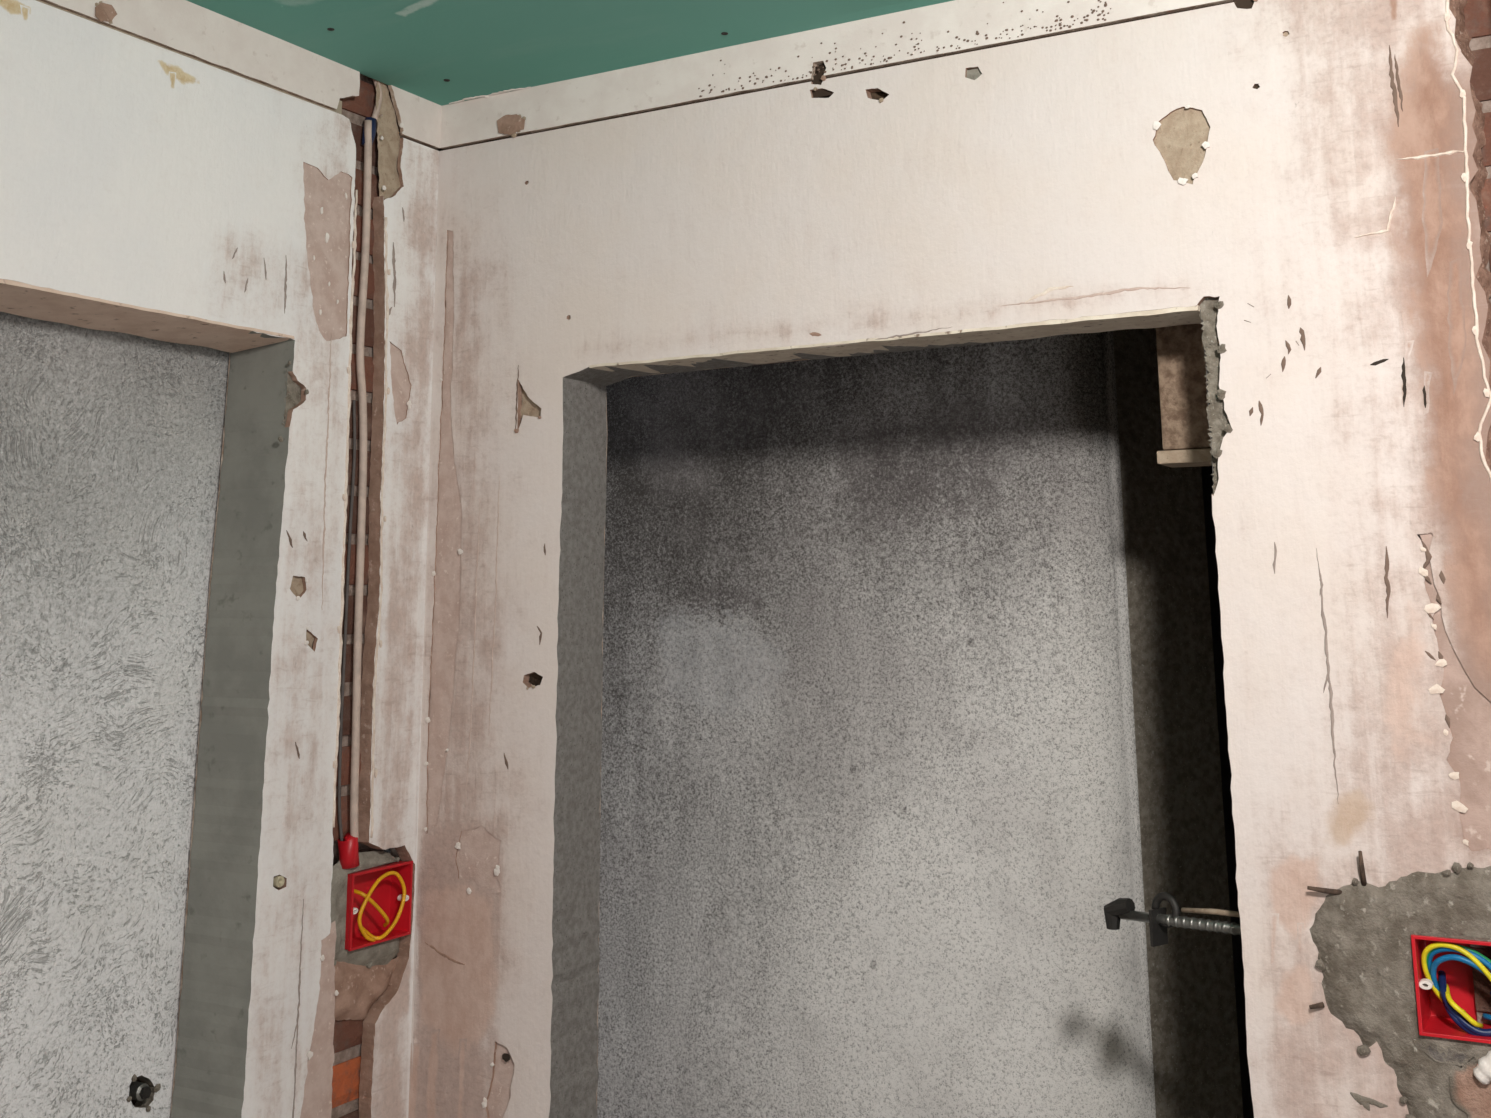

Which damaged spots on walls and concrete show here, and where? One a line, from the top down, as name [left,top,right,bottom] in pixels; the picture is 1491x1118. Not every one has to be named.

flaking render [1153,105,1210,185]
spalling [1269,327,1306,376]
spalling [1199,297,1233,494]
spalling [1249,401,1264,425]
flaking render [303,74,412,841]
flaking render [290,576,308,601]
crack [1271,542,1279,574]
crack [1316,548,1339,804]